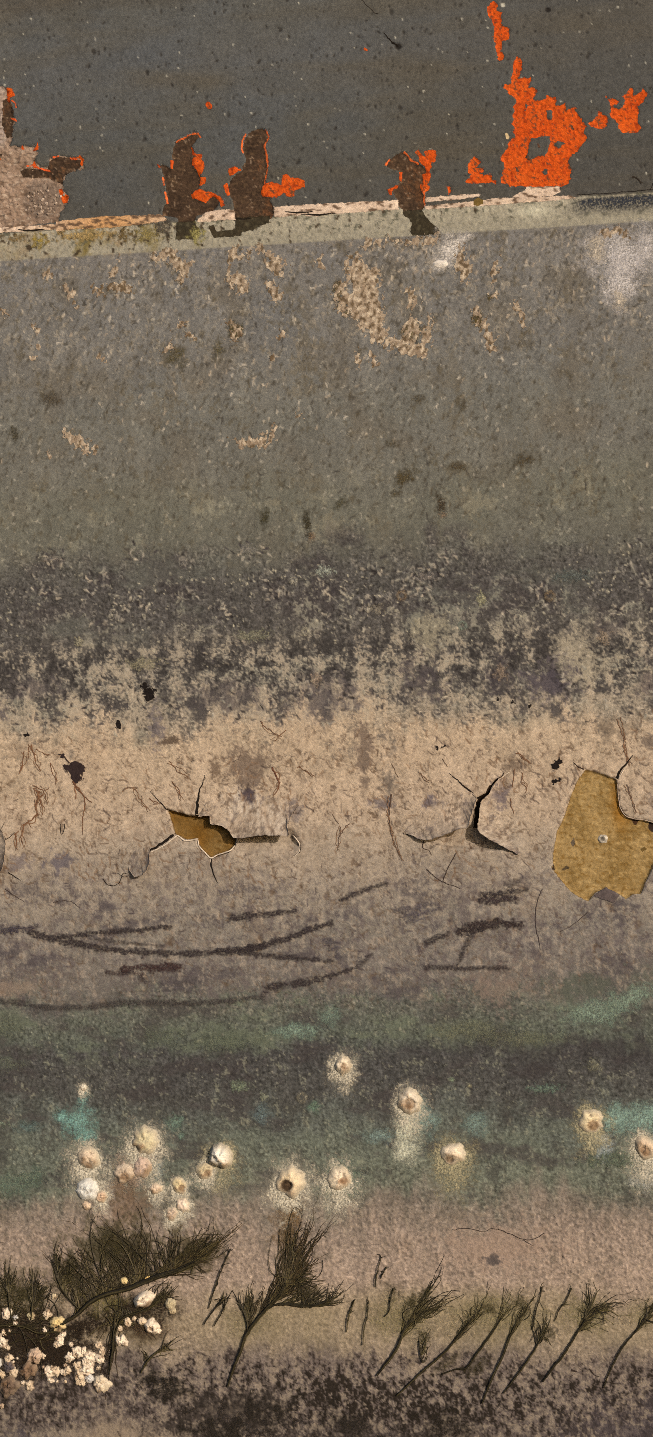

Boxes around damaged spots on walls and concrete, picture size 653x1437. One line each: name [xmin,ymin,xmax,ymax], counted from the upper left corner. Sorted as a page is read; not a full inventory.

spalling [0,86,167,233]
peeling [198,209,251,222]
corrosion [157,129,305,240]
peeling [273,200,399,217]
corrosion [385,150,441,236]
flaking render [198,794,299,838]
flaking render [404,773,518,855]
flaking render [129,845,150,877]